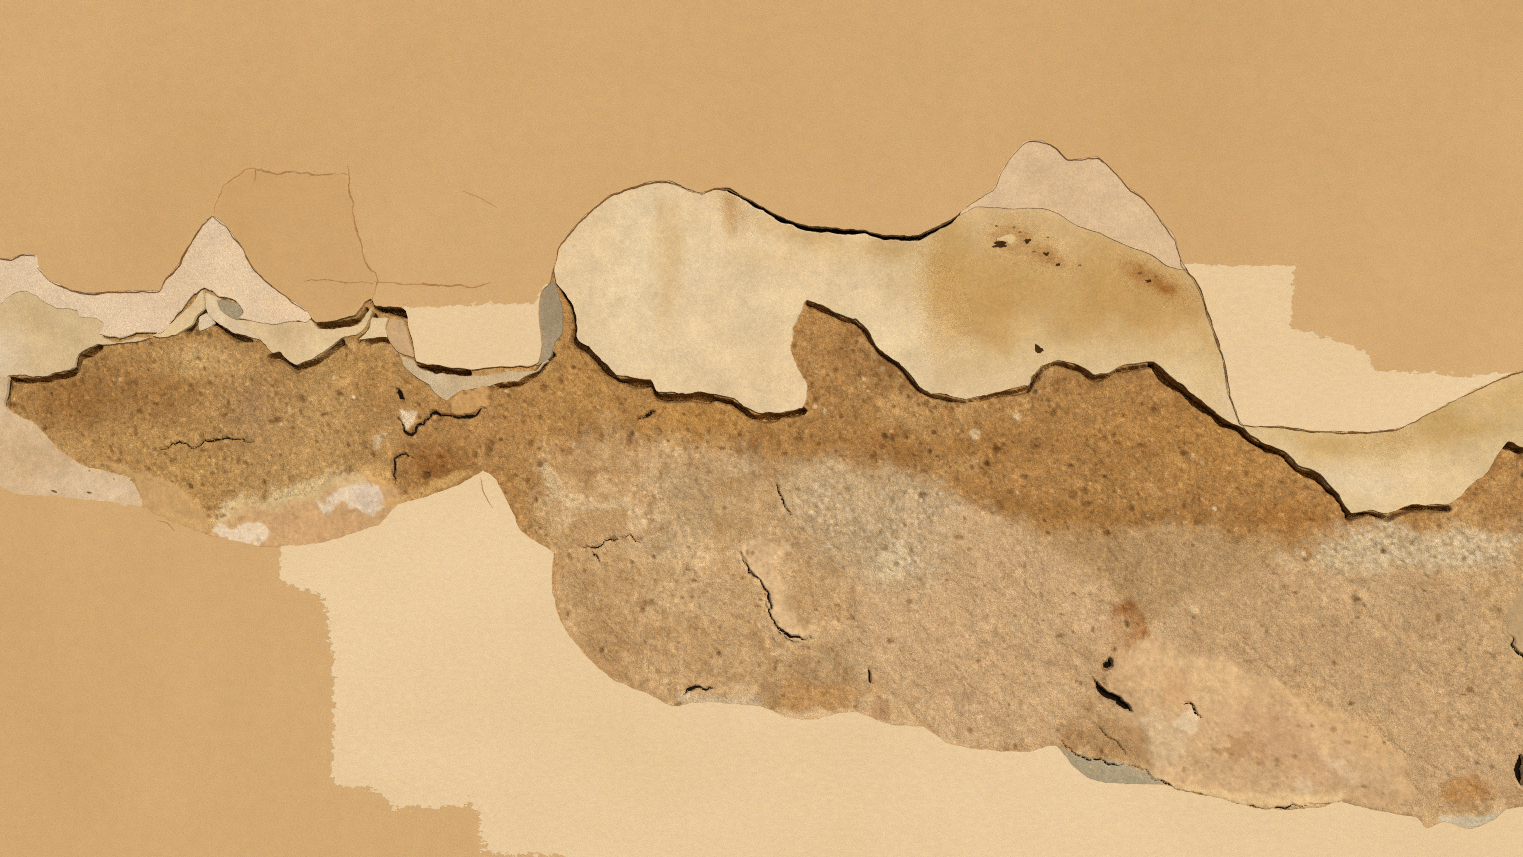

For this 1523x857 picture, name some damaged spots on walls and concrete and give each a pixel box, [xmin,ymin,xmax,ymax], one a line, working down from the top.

crack [214,166,490,302]
spalling [0,140,1523,555]
crack [160,437,248,450]
crack [741,554,806,640]
spalling [534,430,1523,829]
crack [1062,660,1170,785]